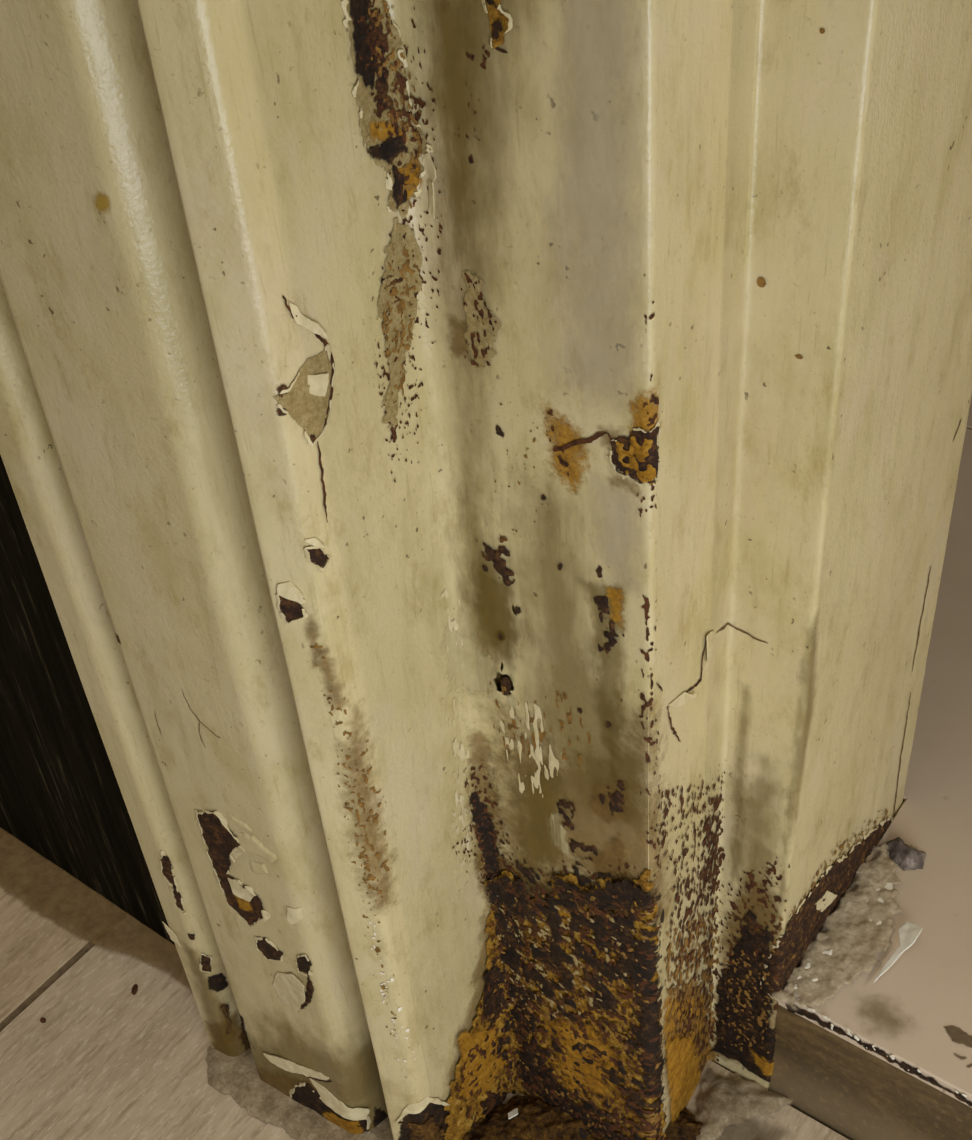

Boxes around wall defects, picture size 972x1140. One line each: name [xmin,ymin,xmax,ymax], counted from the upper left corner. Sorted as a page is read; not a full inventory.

corrosion [340,0,437,220]
peeling [275,581,316,640]
peeling [274,296,335,523]
peeling [304,537,331,572]
corrosion [481,537,515,586]
corrosion [545,392,663,517]
corrosion [594,566,625,654]
peeling [194,810,314,1012]
corrosion [310,643,397,1036]
corrosion [373,735,894,1140]
spalling [772,842,972,1107]
peeling [258,1053,371,1134]